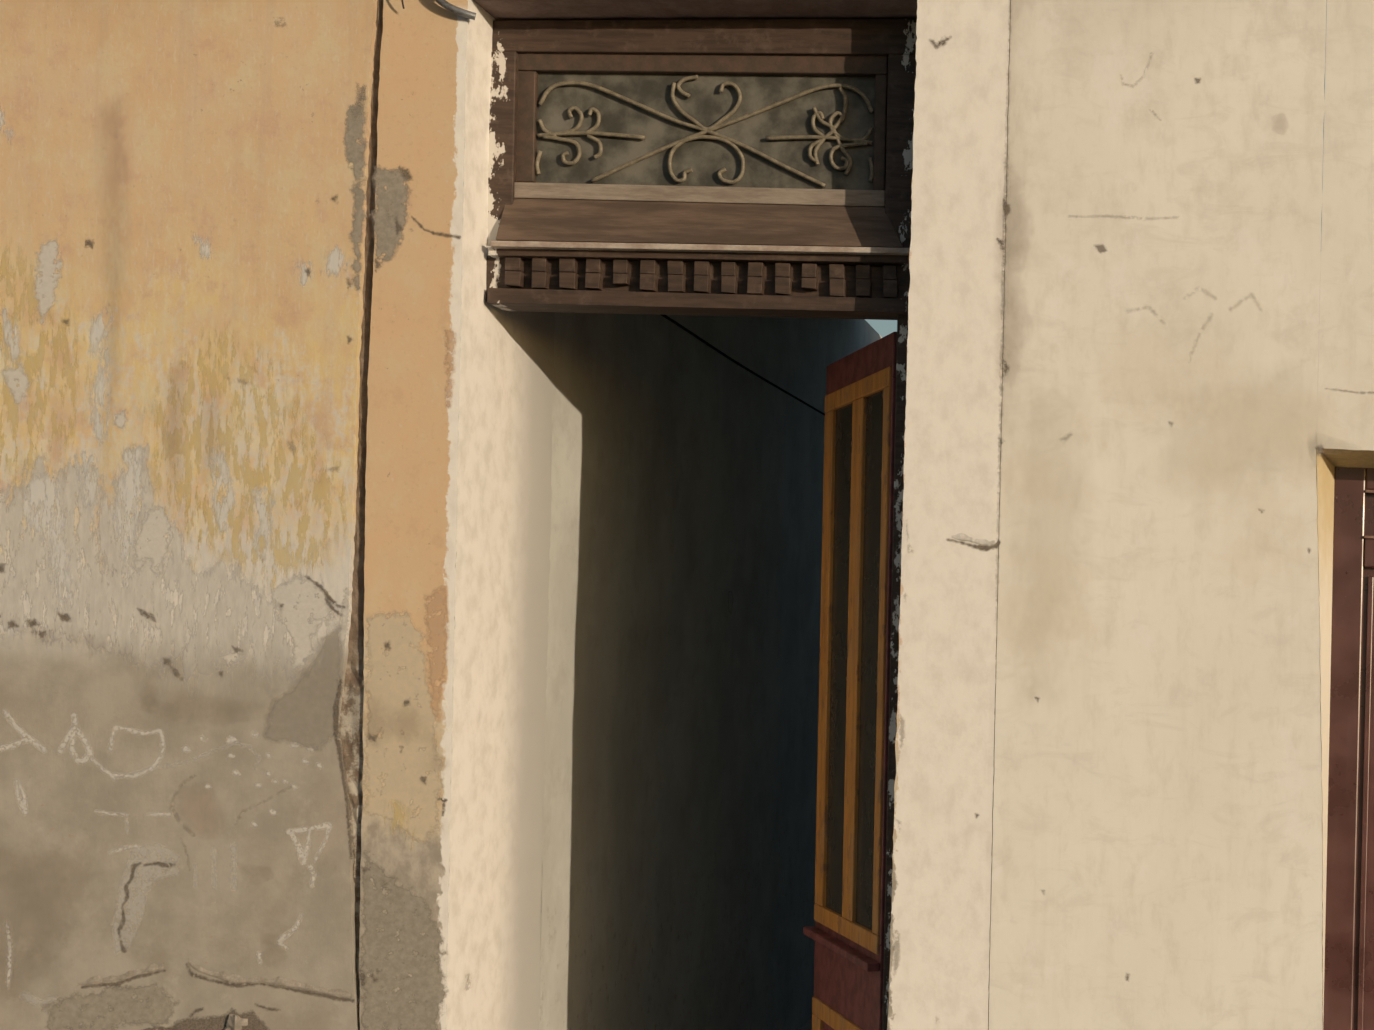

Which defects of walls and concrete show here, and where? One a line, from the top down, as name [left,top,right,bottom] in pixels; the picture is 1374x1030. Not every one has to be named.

spalling [301,86,411,289]
crack [413,218,461,239]
peeling [0,241,345,677]
crack [77,0,383,1010]
peeling [445,330,455,407]
peeling [362,589,447,842]